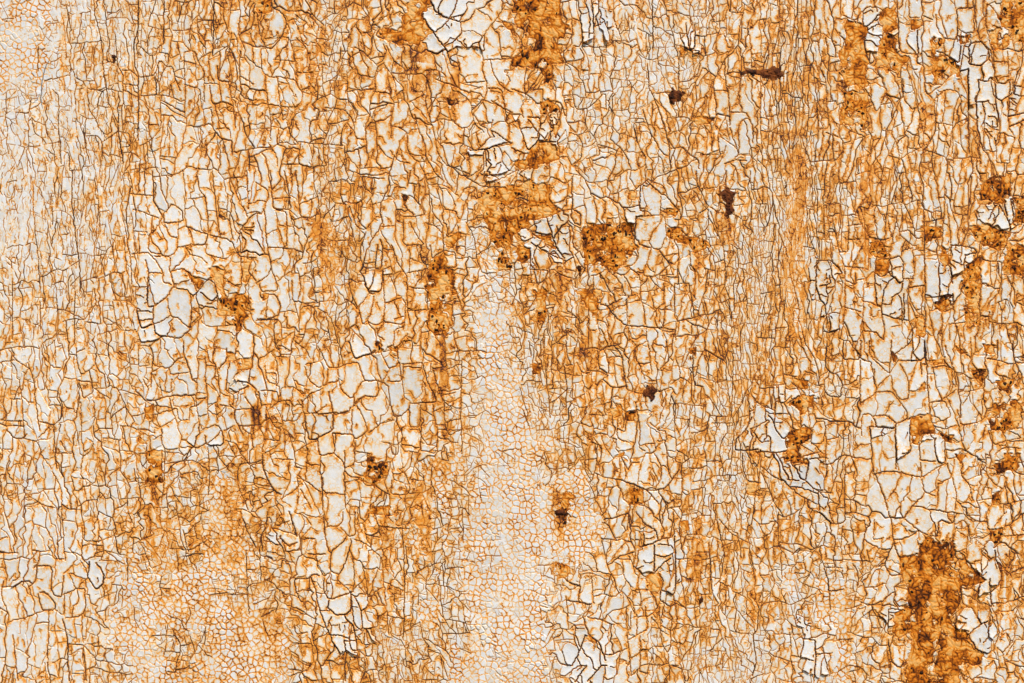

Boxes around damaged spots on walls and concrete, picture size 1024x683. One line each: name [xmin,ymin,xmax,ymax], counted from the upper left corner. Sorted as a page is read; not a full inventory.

peeling [422,0,484,63]
rust [839,5,908,129]
crack [816,1,1022,164]
crack [1,0,606,681]
rust [414,232,461,566]
rust [478,99,661,449]
crack [545,0,792,681]
peeling [743,385,832,522]
crack [787,187,1019,654]
rust [934,174,1024,328]
crack [794,639,831,679]
rust [892,529,1012,683]